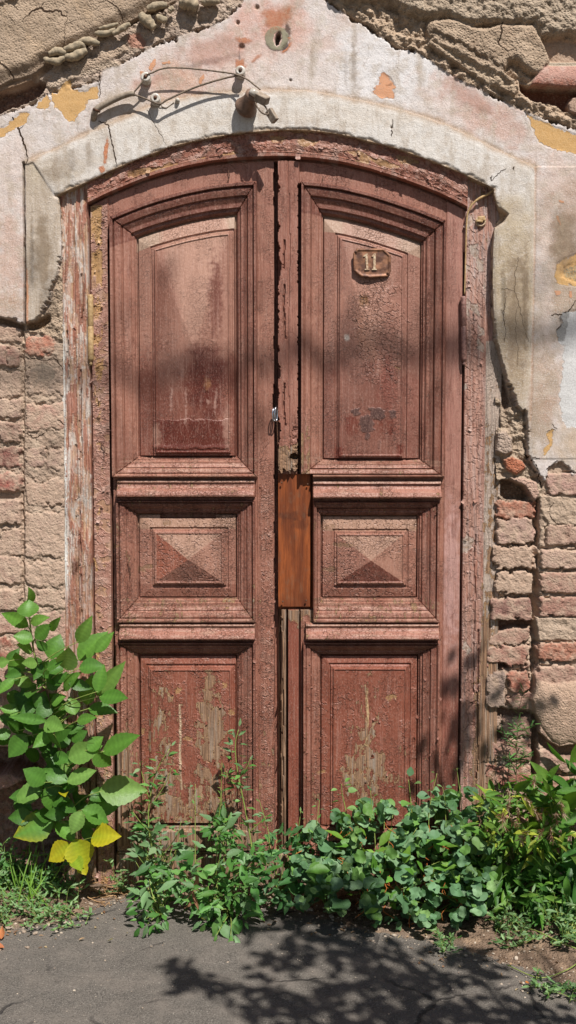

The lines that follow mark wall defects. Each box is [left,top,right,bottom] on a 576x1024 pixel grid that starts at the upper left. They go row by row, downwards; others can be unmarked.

crack [98,68,117,164]
spalling [0,0,243,137]
peeling [372,72,396,99]
peeling [554,254,576,298]
flaking render [466,377,543,502]